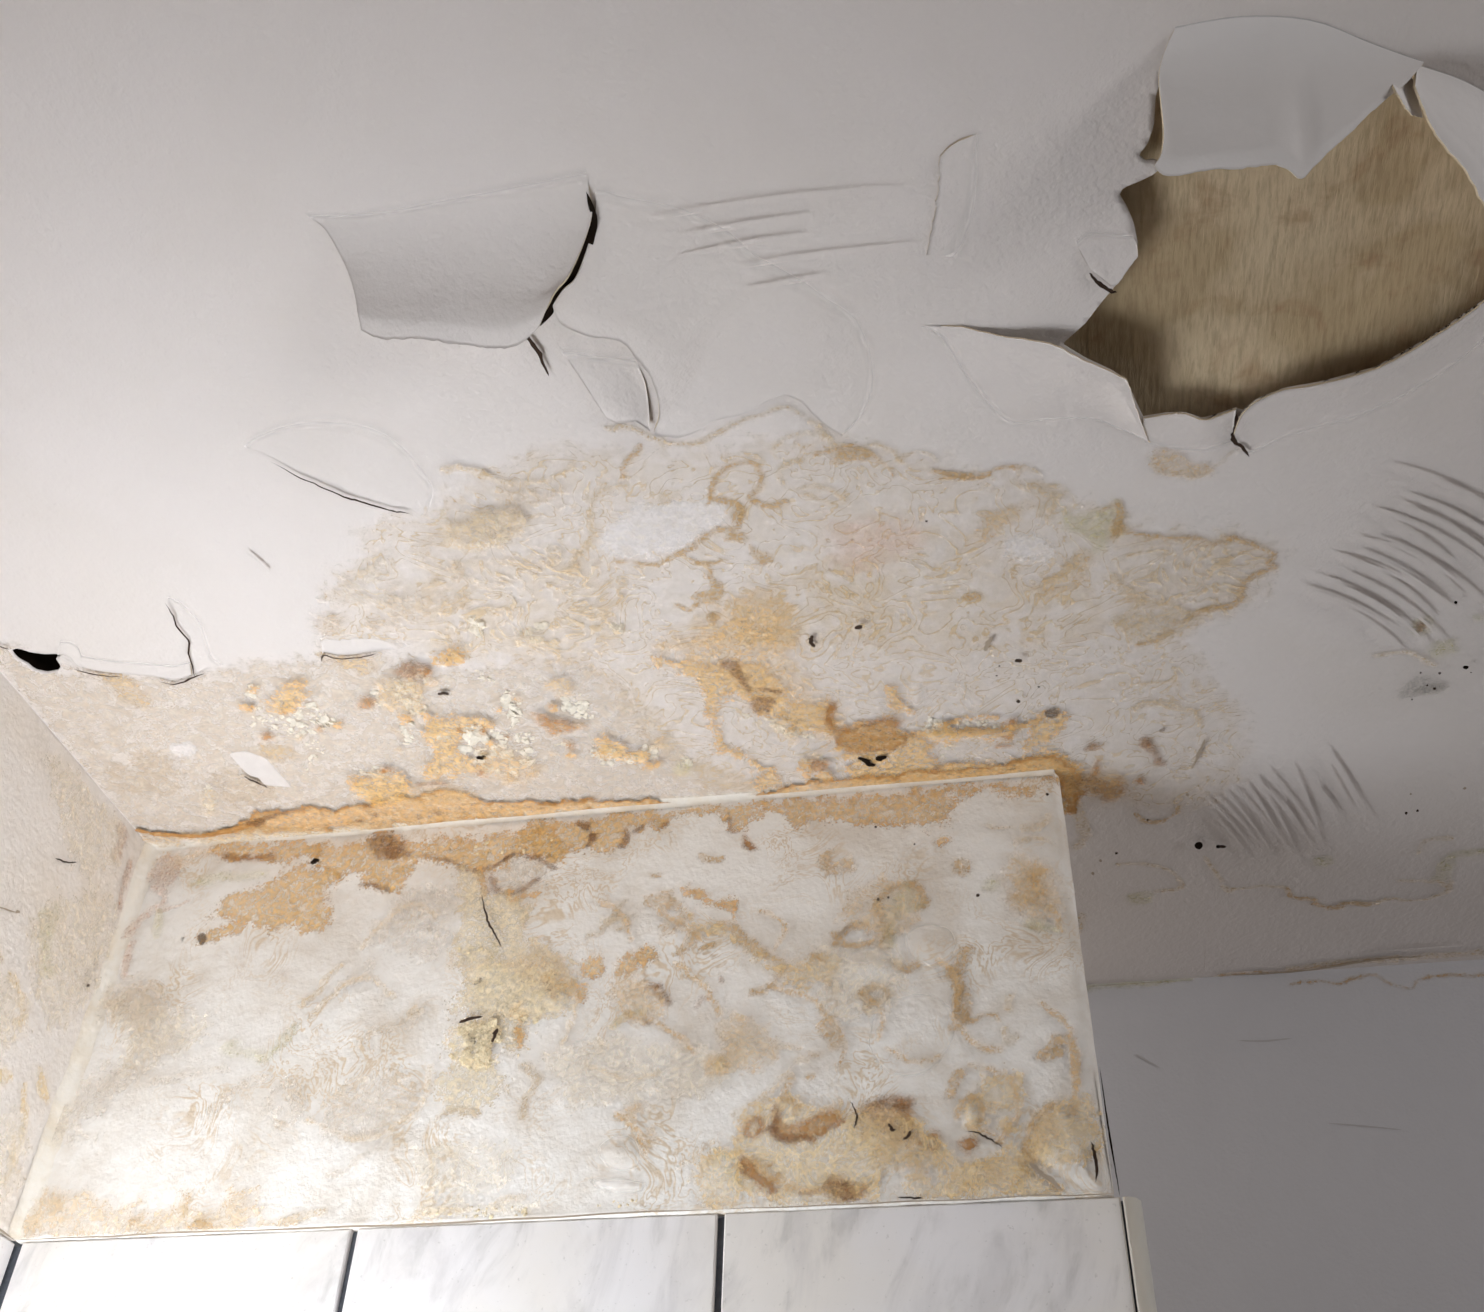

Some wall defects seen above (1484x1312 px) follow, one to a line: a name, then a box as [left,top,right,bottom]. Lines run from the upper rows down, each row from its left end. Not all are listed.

crack [527,192,598,376]
peeling [311,178,869,438]
peeling [0,600,218,685]
peeling [248,427,430,515]
peeling [321,637,401,661]
water stain [0,615,733,869]
water stain [606,461,799,643]
water stain [742,713,832,783]
water stain [889,699,1025,773]
water stain [448,943,562,1072]
water stain [547,874,931,1098]
water stain [944,946,1103,1198]